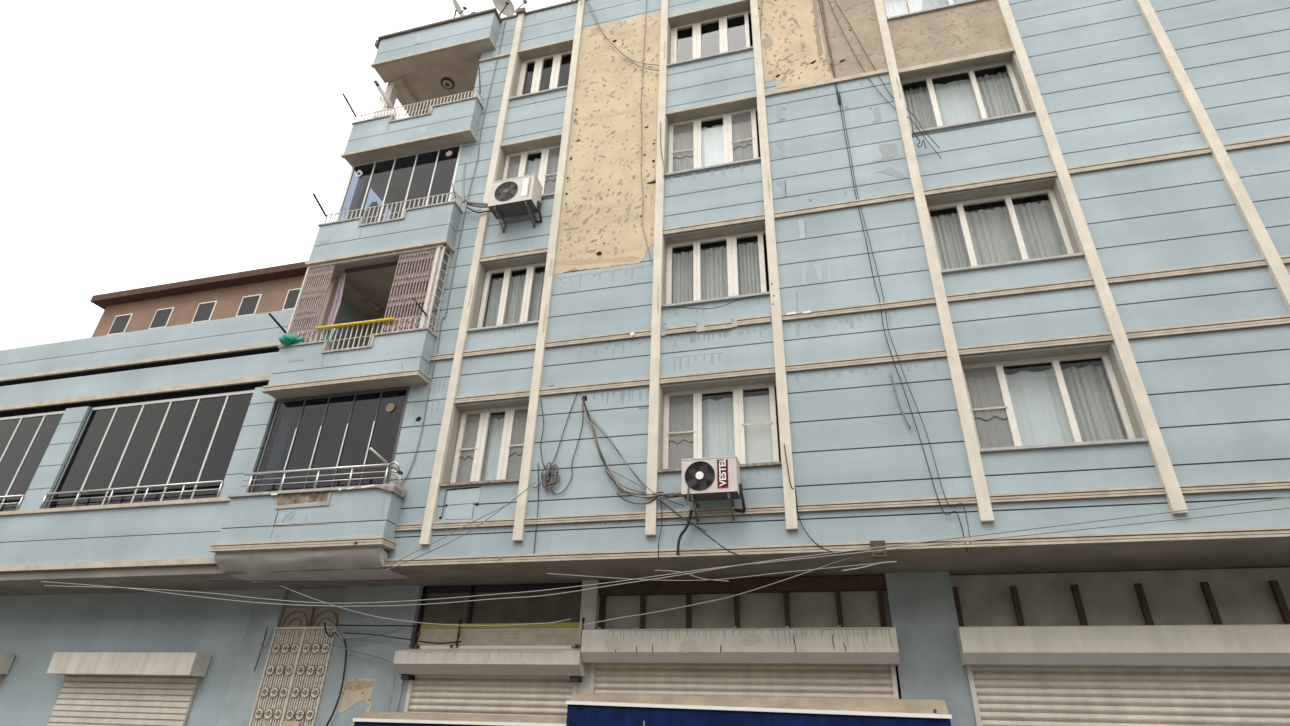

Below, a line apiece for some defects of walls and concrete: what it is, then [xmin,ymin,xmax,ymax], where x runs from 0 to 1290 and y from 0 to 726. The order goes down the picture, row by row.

spalling [776,57,845,78]
peeling [337,678,378,714]